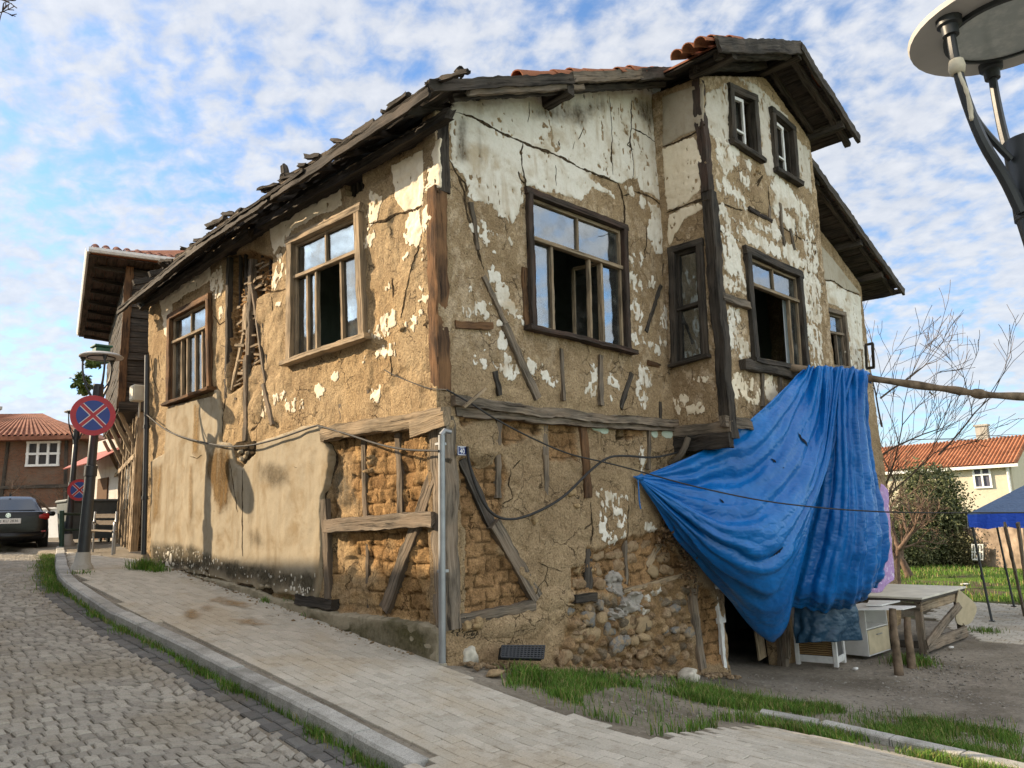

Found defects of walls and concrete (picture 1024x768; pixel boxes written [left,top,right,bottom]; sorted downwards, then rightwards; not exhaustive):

peeling [362,286,429,364]
crack [391,245,429,328]
peeling [402,205,431,261]
crack [367,161,484,269]
peeling [462,184,558,388]
crack [455,98,744,275]
peeling [715,137,824,367]
peeling [732,372,779,405]
damp [262,466,282,484]
crack [503,460,520,504]
crack [585,502,594,542]
damp [152,545,314,593]